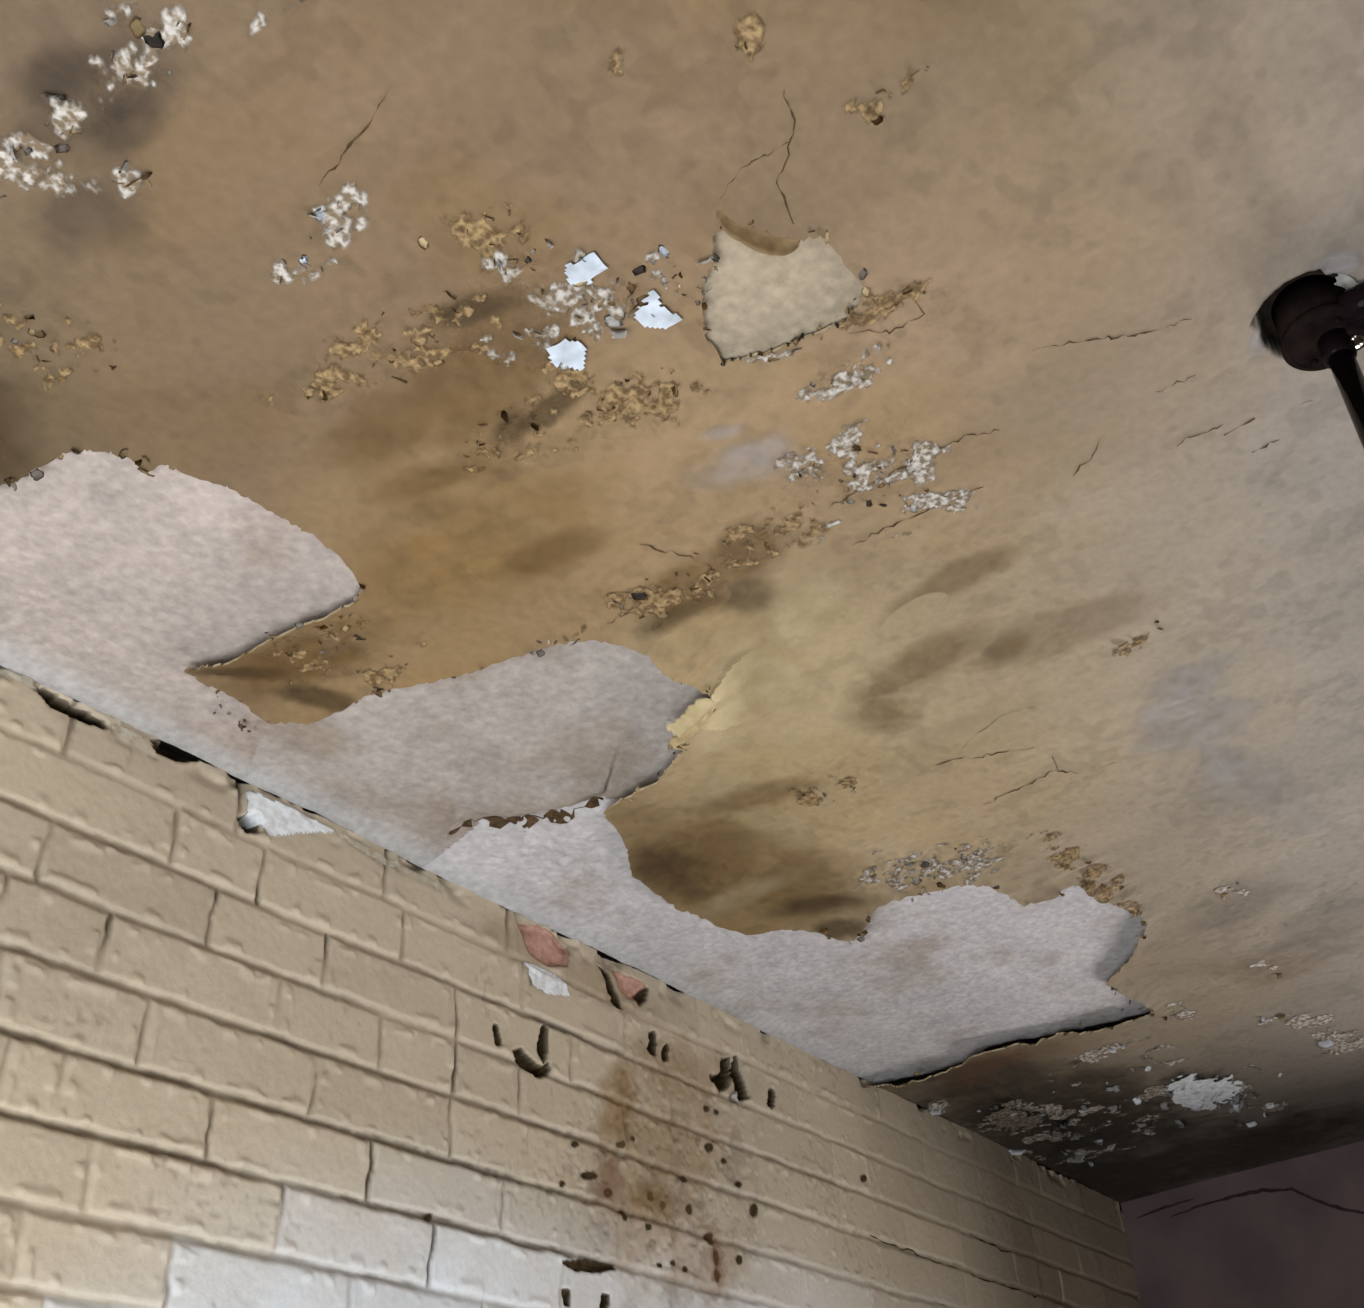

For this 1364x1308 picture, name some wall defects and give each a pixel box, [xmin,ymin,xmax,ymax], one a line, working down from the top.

peeling [88,3,192,103]
peeling [0,93,98,199]
peeling [113,160,153,199]
peeling [0,303,115,388]
flaking render [302,204,932,473]
flaking render [0,421,1197,1084]
peeling [1249,960,1282,979]
hole [709,1057,747,1105]
peeling [977,1036,1290,1167]
crack [1137,1187,1364,1218]